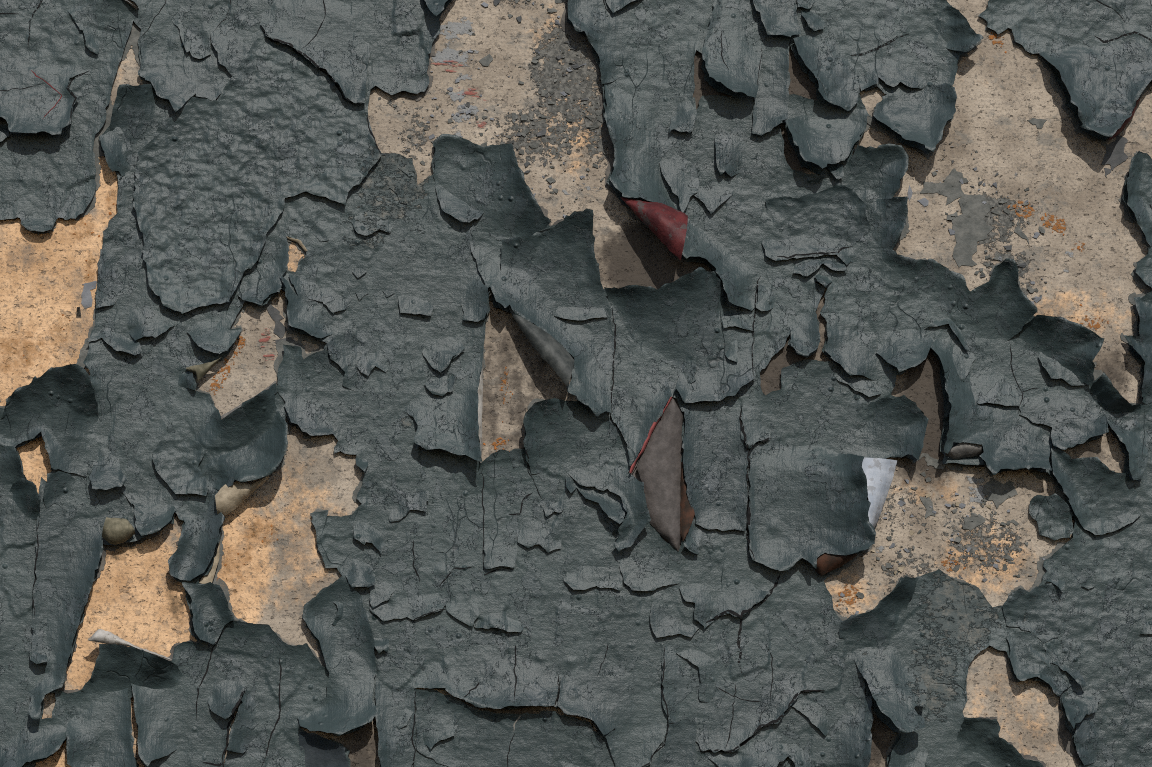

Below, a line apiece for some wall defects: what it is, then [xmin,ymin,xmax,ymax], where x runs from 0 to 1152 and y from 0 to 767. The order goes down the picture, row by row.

peeling [0,0,776,767]
peeling [652,0,1152,767]
crack [261,659,282,767]
crack [409,691,417,767]
crack [507,646,521,767]
crack [642,650,672,767]